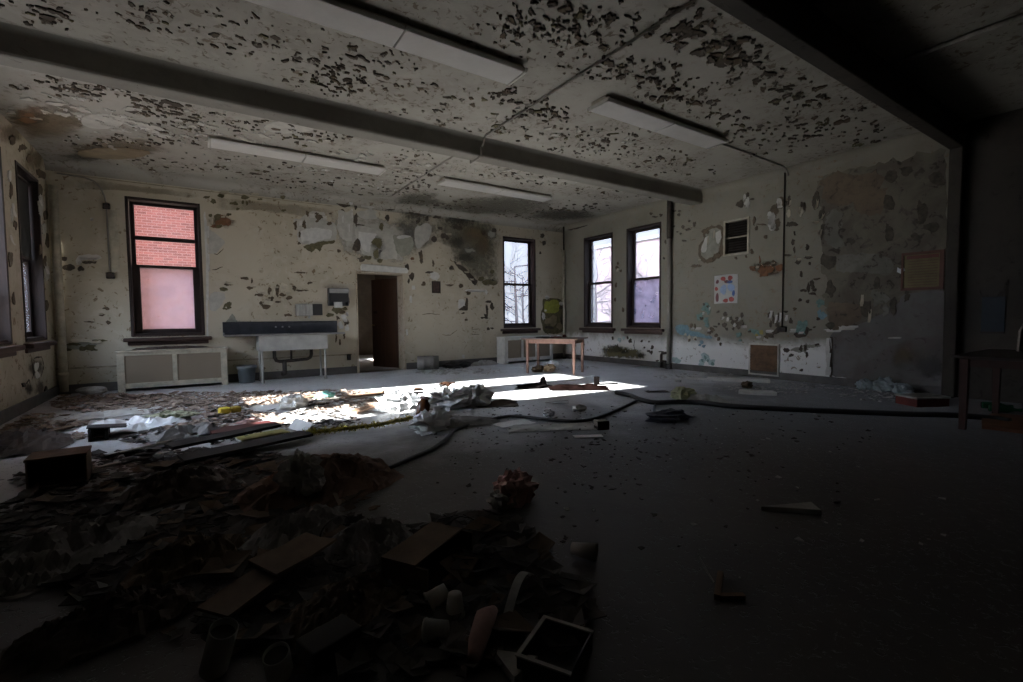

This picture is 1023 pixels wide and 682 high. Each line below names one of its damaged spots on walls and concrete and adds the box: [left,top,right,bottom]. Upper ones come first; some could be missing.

peeling [23,0,74,31]
peeling [115,0,696,177]
peeling [466,0,886,155]
leakage [1,107,80,176]
flaking render [6,75,482,286]
peeling [474,167,651,220]
leakage [342,195,594,286]
spalling [447,284,496,330]
flaking render [672,148,948,387]